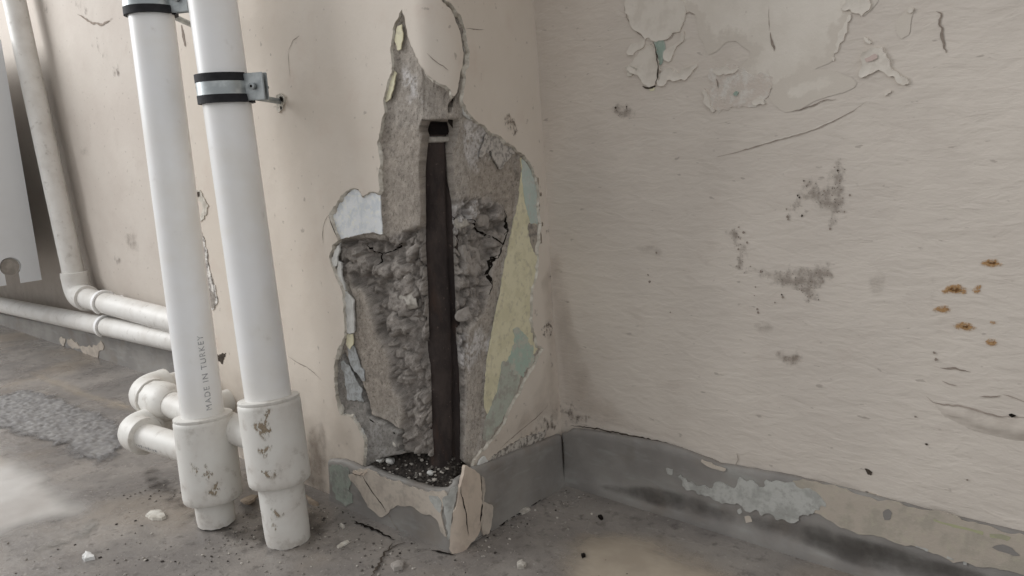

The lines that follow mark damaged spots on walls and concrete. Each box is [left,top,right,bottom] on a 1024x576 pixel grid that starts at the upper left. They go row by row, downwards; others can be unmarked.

peeling [624,0,909,113]
peeling [202,235,218,310]
crack [367,243,402,271]
flaking render [329,0,546,537]
rust [426,122,464,470]
crack [467,205,509,294]
rust [942,284,981,294]
peeling [59,337,105,358]
crack [461,484,483,534]